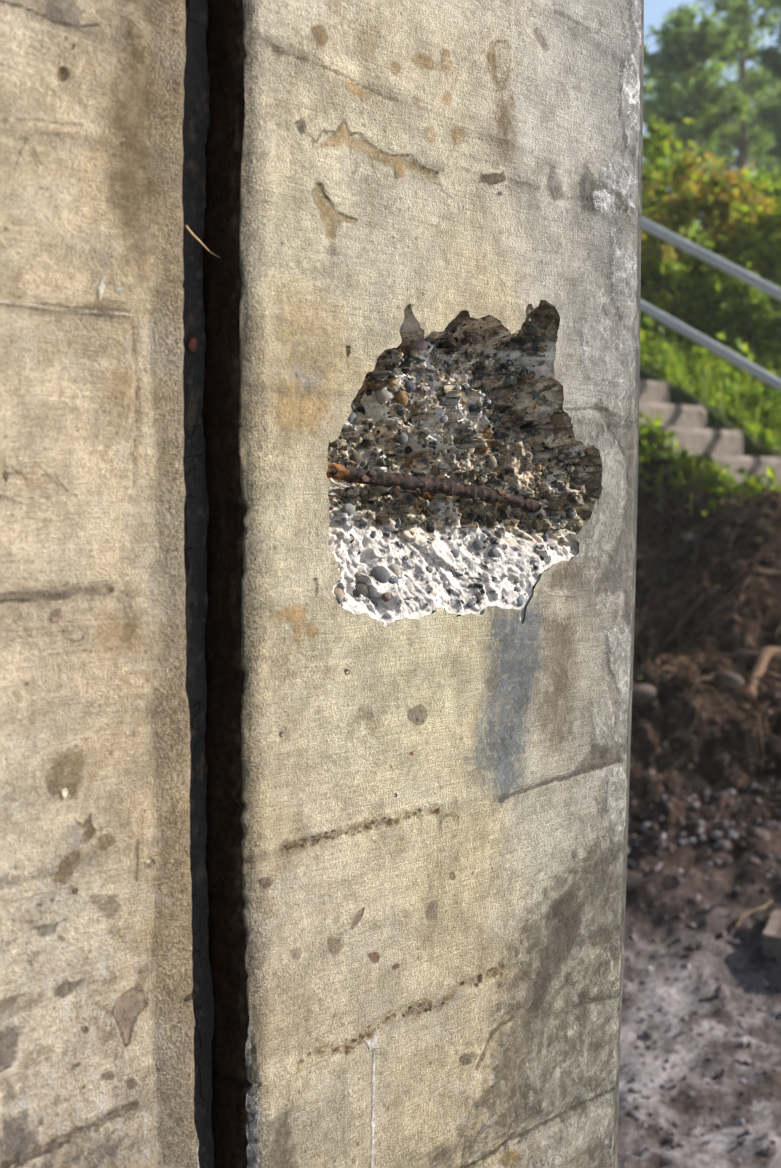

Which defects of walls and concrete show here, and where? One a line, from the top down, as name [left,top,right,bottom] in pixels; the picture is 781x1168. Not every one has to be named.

peeling [295,119,438,178]
peeling [481,171,506,195]
peeling [579,168,602,215]
corrosion [326,462,541,513]
spalling [328,300,602,627]
leakage [408,704,427,725]
leakage [471,610,576,796]
leakage [428,766,626,1168]
crack [461,1016,514,1070]
leakage [366,1035,379,1168]
crack [464,1088,615,1168]